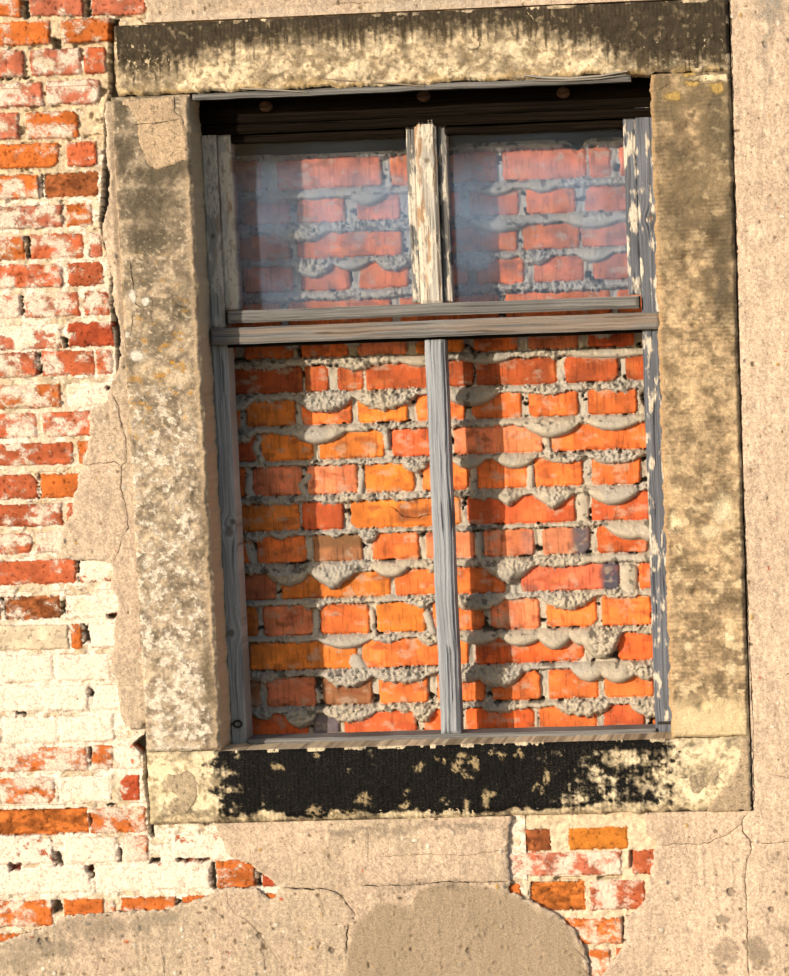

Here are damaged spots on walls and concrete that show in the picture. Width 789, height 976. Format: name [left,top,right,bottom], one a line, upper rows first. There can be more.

peeling [0,0,26,57]
crack [85,396,132,560]
peeling [0,9,290,945]
damp [128,387,214,752]
crack [659,3,789,976]
damp [201,739,681,819]
crack [226,889,287,970]
crack [288,881,508,949]
spalling [503,810,661,976]